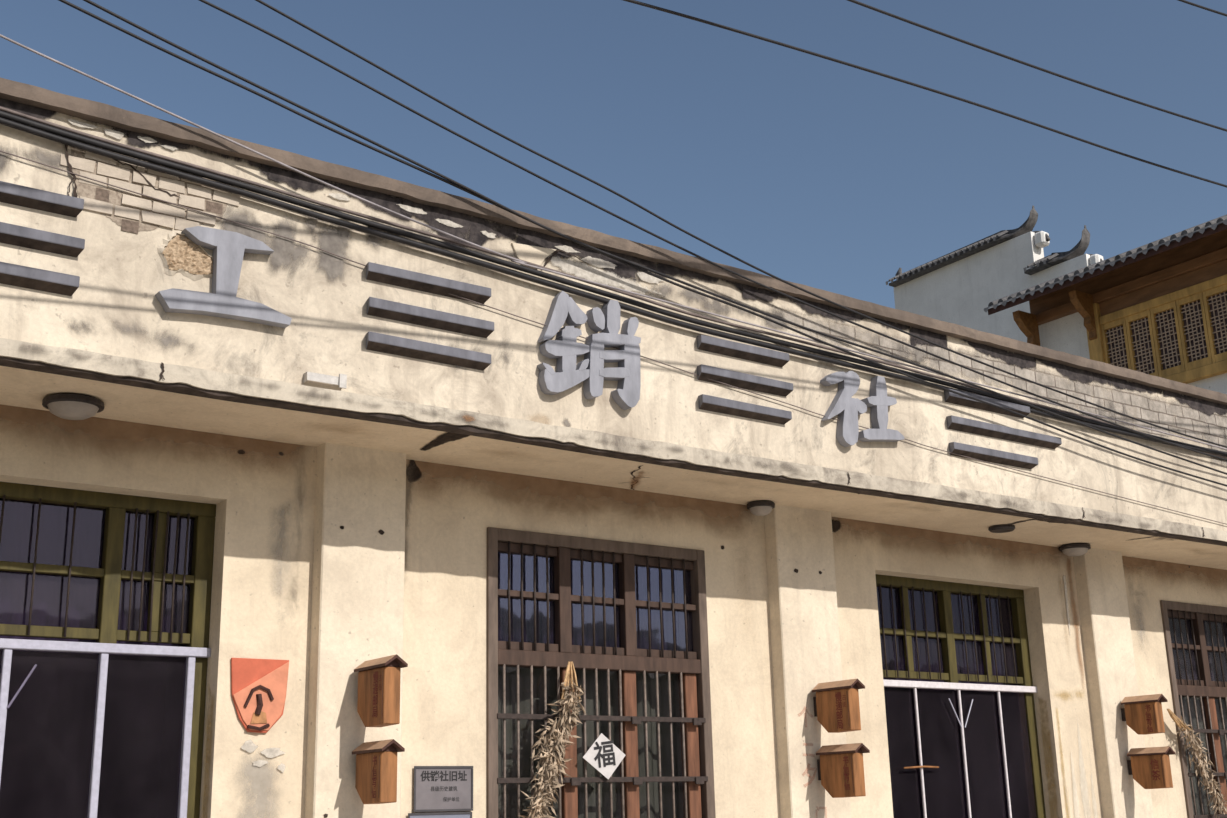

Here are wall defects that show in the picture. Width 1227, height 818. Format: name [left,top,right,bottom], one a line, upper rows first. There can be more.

peeling [60,119,240,281]
peeling [398,204,463,228]
peeling [511,243,663,294]
crack [627,465,649,490]